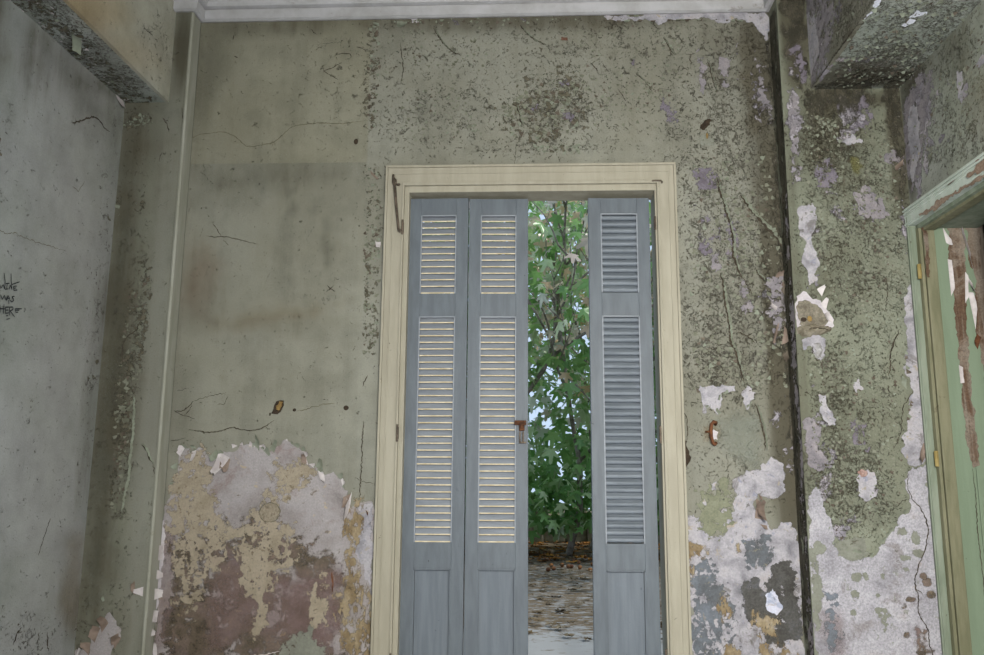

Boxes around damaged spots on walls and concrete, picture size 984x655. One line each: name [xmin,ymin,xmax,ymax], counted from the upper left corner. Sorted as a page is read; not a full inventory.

crack [159,112,365,161]
peeling [688,0,984,655]
crack [885,282,913,449]
peeling [75,612,121,655]
peeling [131,435,375,655]
crack [898,474,933,655]